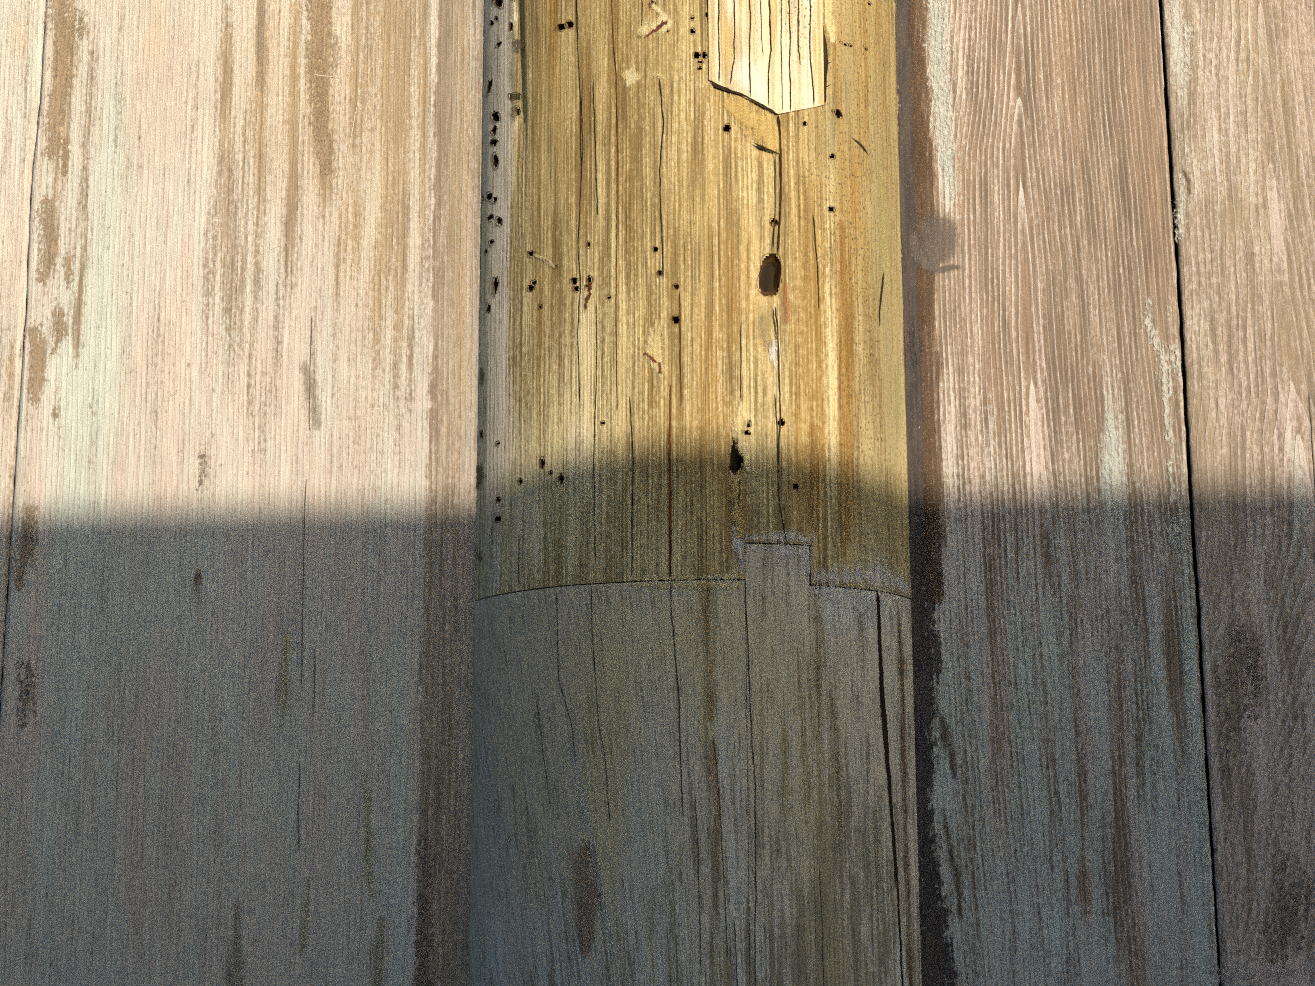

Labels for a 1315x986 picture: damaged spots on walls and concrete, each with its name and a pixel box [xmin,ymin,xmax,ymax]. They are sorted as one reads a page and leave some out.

crack [876,592,904,986]